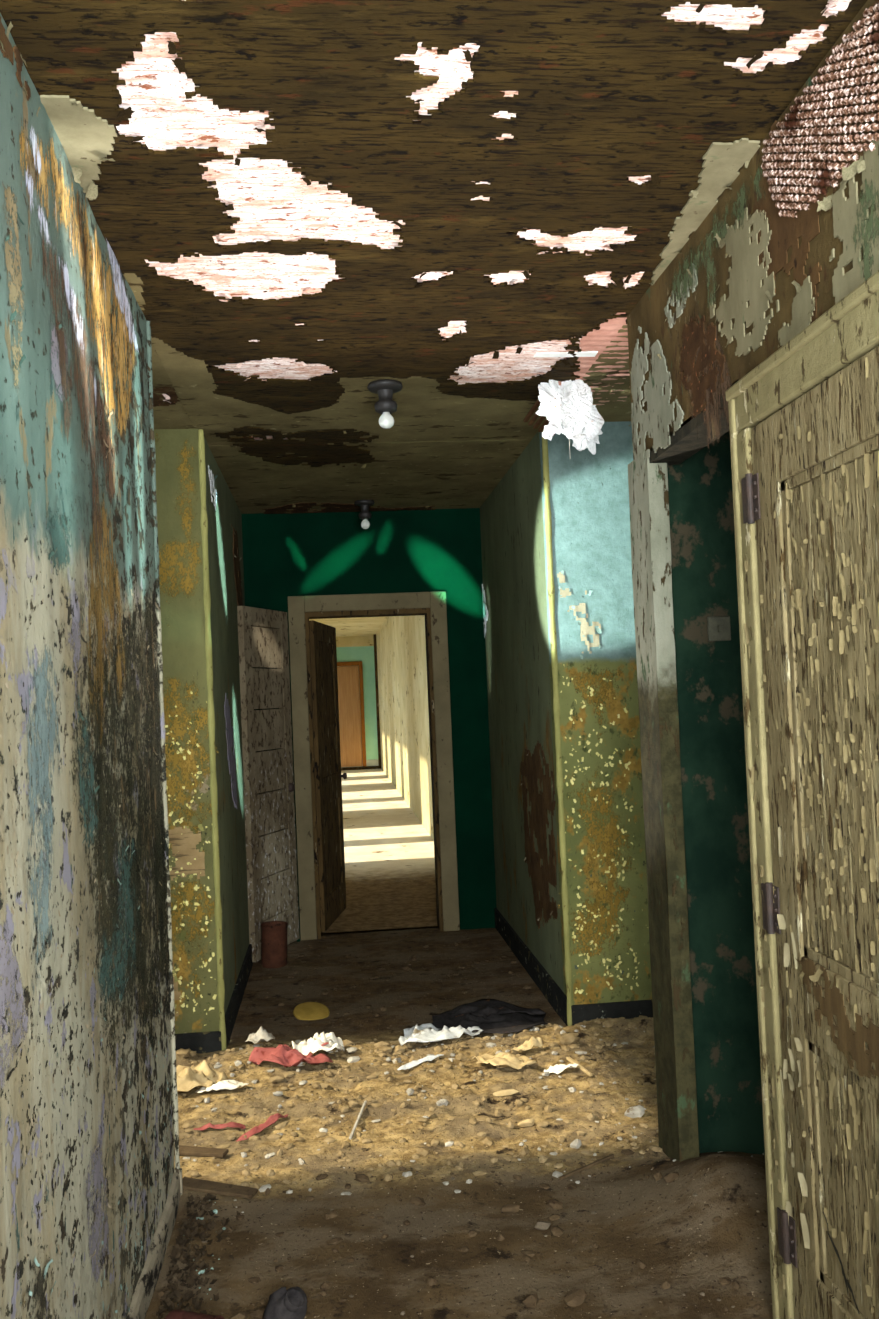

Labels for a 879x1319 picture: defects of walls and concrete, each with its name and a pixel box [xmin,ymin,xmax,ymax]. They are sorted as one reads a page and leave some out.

flaking render [395,42,480,121]
flaking render [0,16,405,302]
flaking render [584,0,879,324]
flaking render [484,271,532,286]
flaking render [516,227,637,256]
flaking render [450,338,582,385]
damp [25,127,169,1070]
peeling [557,570,602,659]
peeling [744,448,879,1319]